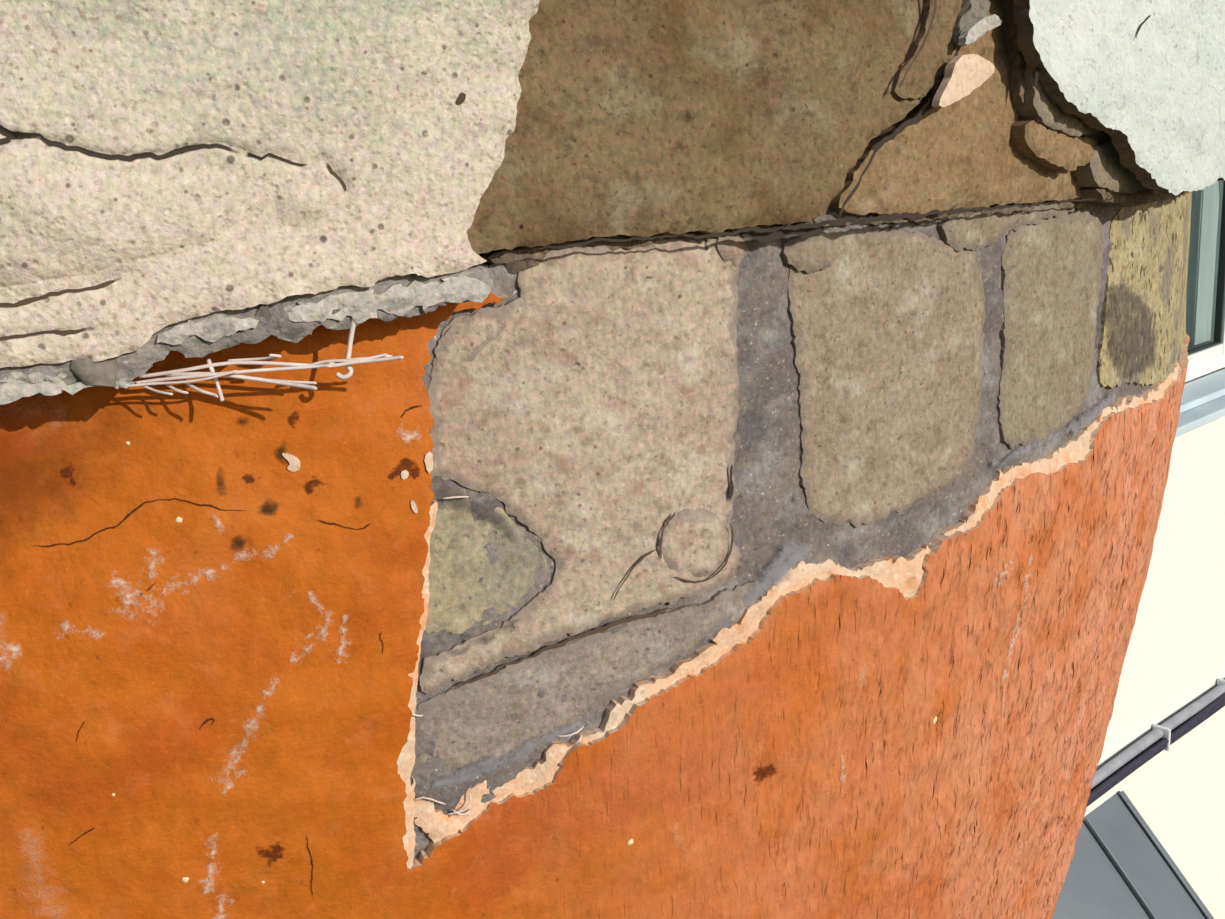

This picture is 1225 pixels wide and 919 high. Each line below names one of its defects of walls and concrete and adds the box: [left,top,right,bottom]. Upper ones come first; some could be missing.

crack [0,125,347,191]
spalling [0,264,493,405]
peeling [282,453,300,472]
spalling [397,0,1192,868]
crack [40,498,243,547]
damp [112,579,138,612]
damp [291,592,347,662]
damp [224,685,274,793]
damp [203,833,224,919]